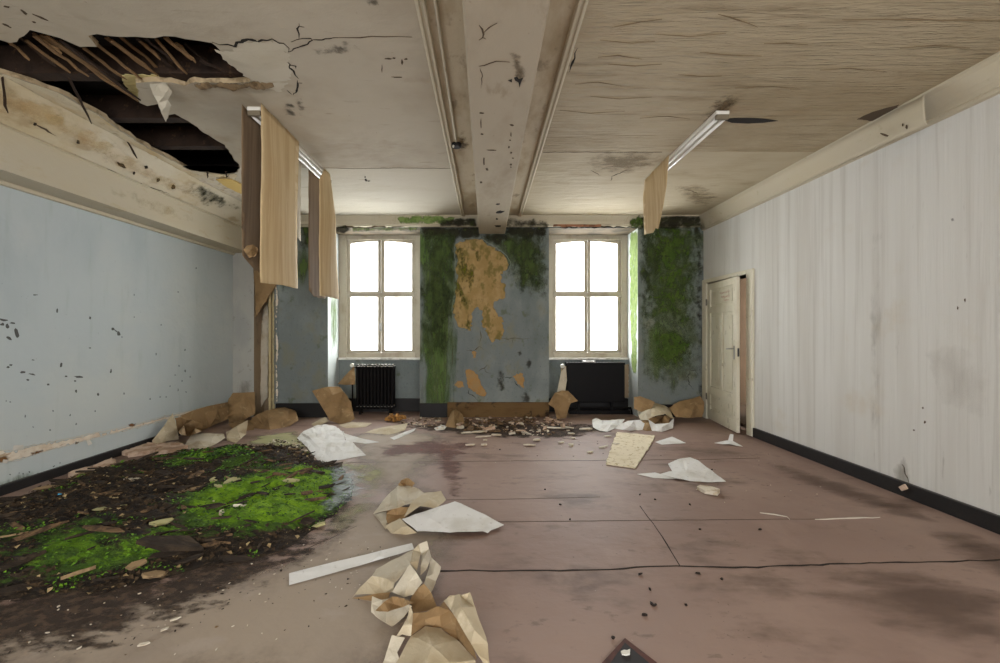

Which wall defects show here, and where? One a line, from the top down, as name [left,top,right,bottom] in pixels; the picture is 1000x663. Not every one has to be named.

crack [212,26,338,95]
spalling [195,81,274,91]
flaking render [1,74,242,199]
water stain [199,187,225,205]
water stain [641,215,702,238]
peeling [452,238,511,344]
peeling [453,349,488,397]